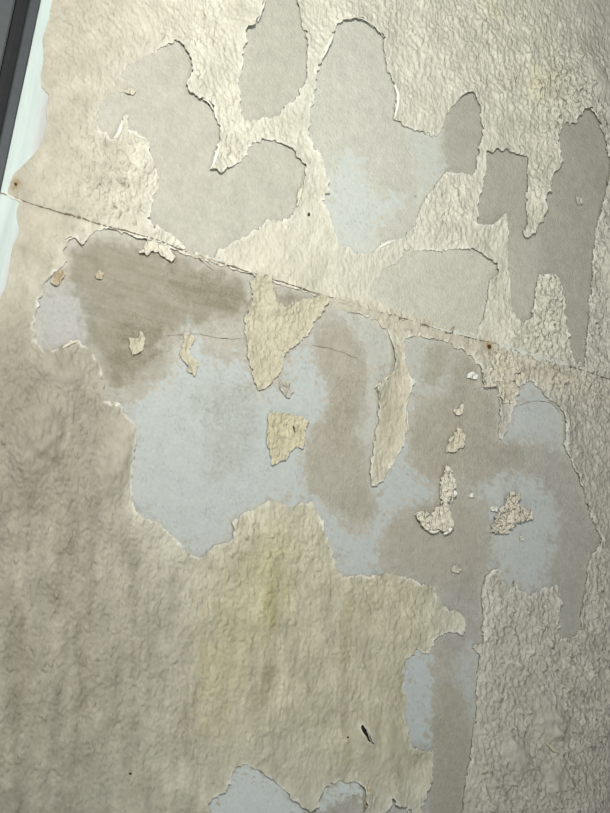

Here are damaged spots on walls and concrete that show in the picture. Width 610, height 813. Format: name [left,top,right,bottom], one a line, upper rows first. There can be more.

peeling [97,40,306,257]
crack [0,191,610,380]
peeling [238,0,610,367]
peeling [32,228,602,813]